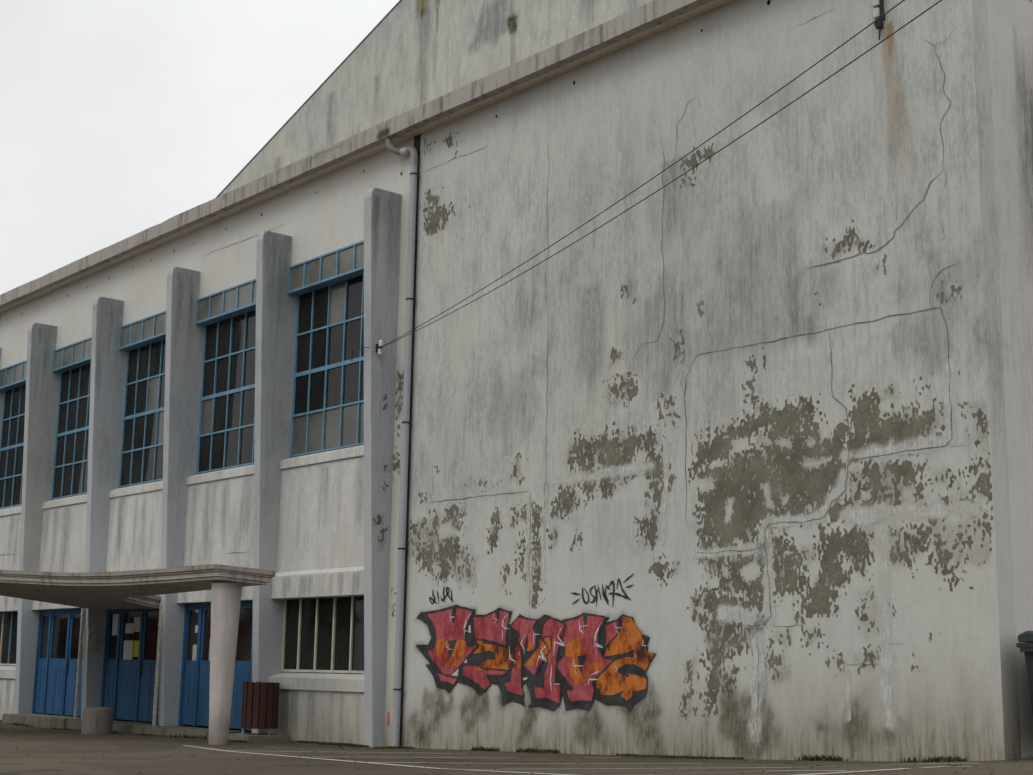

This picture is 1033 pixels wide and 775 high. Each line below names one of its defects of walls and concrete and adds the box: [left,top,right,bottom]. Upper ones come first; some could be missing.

leakage [470,2,517,48]
peeling [680,143,714,188]
crack [806,37,951,269]
peeling [419,186,474,236]
peeling [823,219,887,278]
peeling [464,452,525,492]
crack [684,263,962,735]
peeling [408,490,478,593]
peeling [487,343,993,724]
leakage [724,691,770,754]